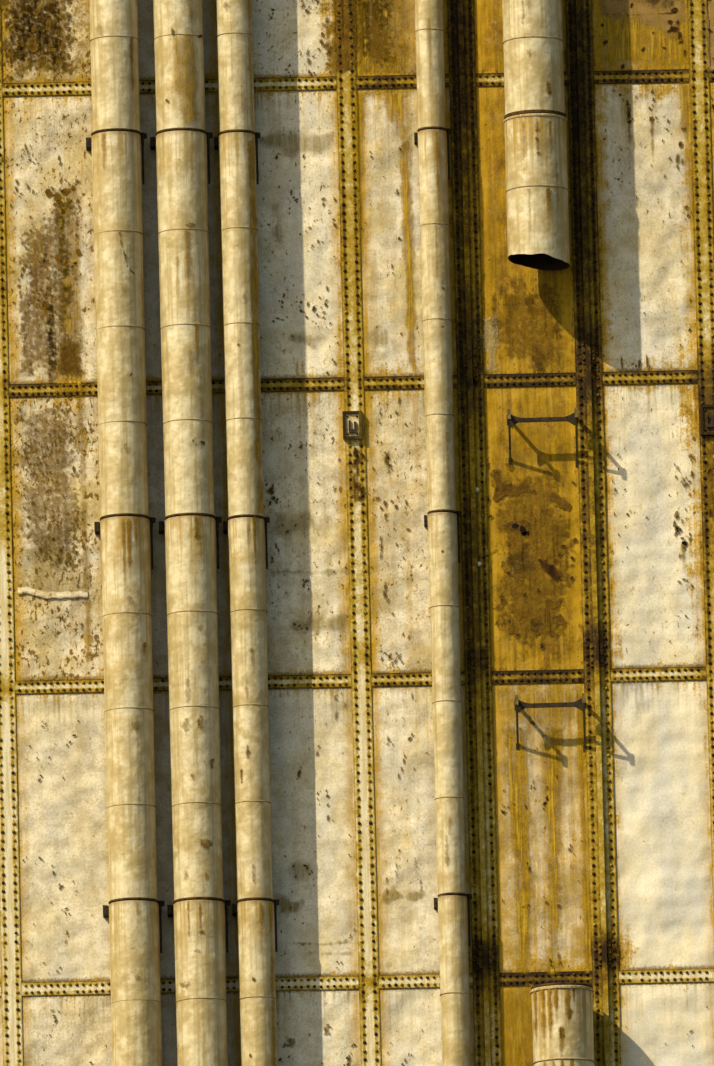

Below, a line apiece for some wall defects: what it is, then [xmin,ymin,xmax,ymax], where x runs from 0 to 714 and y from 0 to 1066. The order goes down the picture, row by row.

corrosion [0,0,76,80]
corrosion [300,0,408,178]
peeling [596,0,688,69]
peeling [706,0,714,70]
corrosion [382,90,416,370]
corrosion [10,155,92,661]